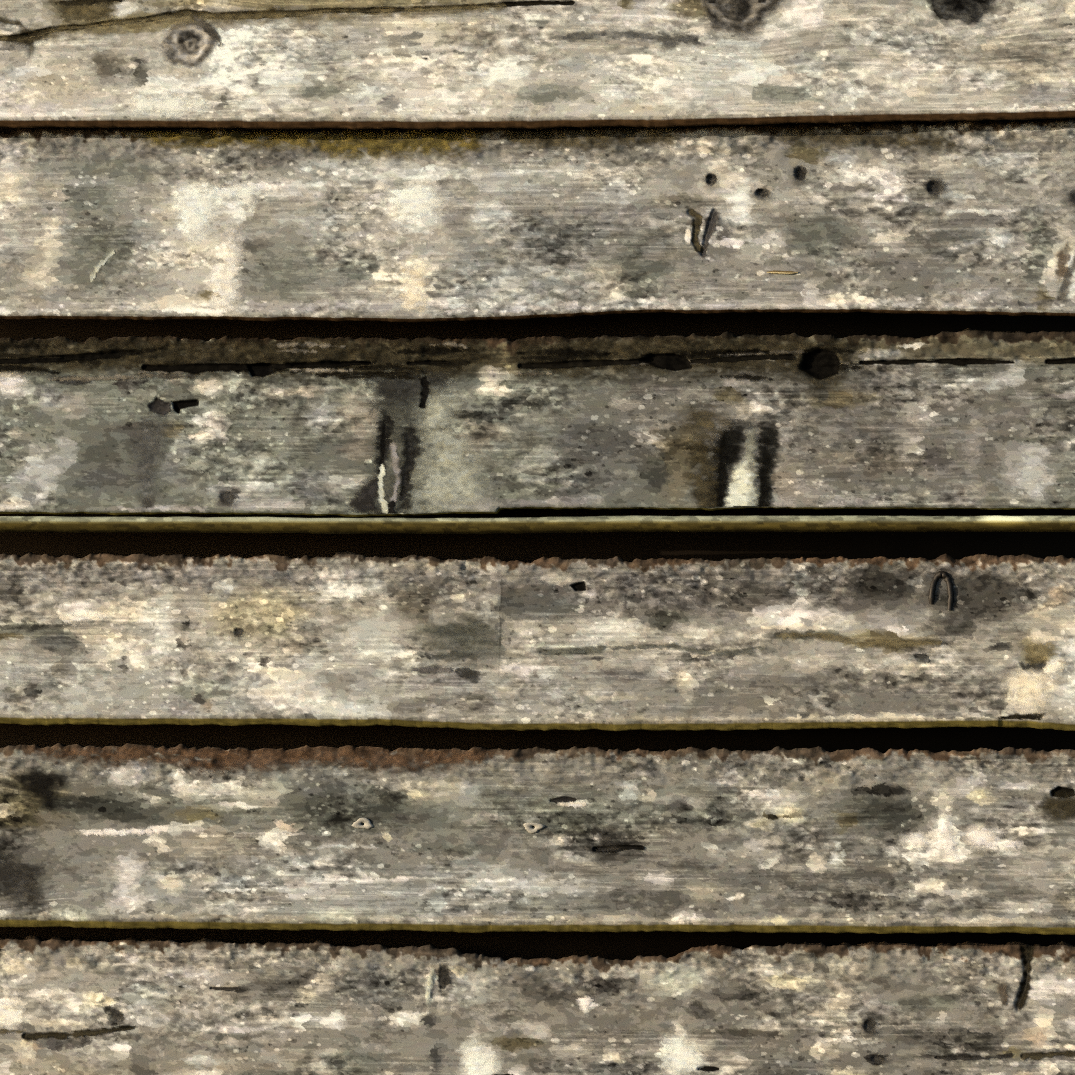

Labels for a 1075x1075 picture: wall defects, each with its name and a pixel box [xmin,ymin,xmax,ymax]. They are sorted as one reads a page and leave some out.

crack [0,0,575,54]
crack [0,352,448,377]
crack [517,357,654,369]
crack [690,354,795,363]
crack [859,358,1014,366]
crack [1045,357,1075,365]
leakage [272,347,477,513]
leakage [681,411,779,507]